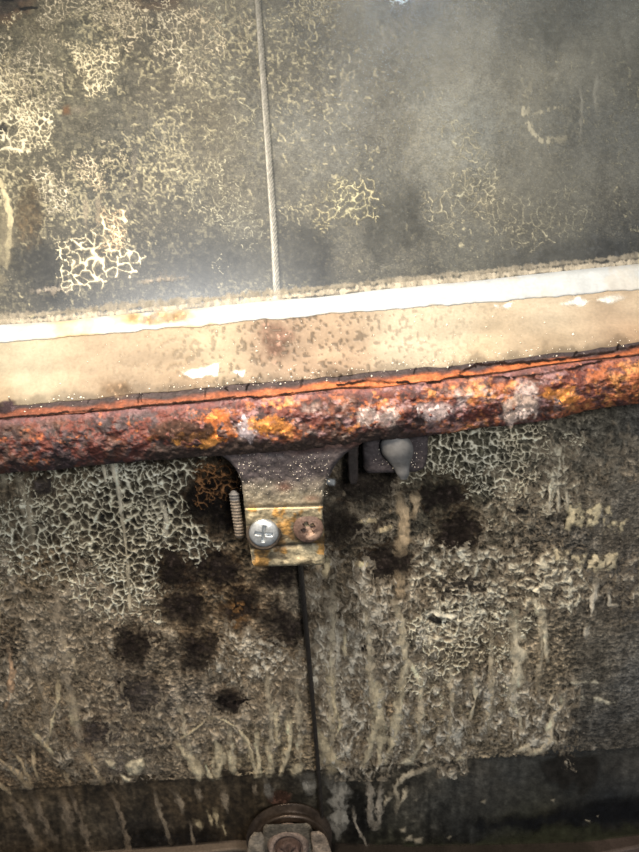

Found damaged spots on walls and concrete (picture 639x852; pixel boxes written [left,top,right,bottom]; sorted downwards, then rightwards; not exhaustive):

rust [0,342,639,474]
water stain [101,463,132,610]
water stain [379,496,420,547]
water stain [116,800,226,848]
water stain [176,686,305,779]
water stain [318,616,347,765]
water stain [329,767,428,842]
water stain [364,615,404,763]
water stain [397,615,425,742]
water stain [508,627,525,694]
water stain [516,695,564,754]
water stain [543,755,599,794]